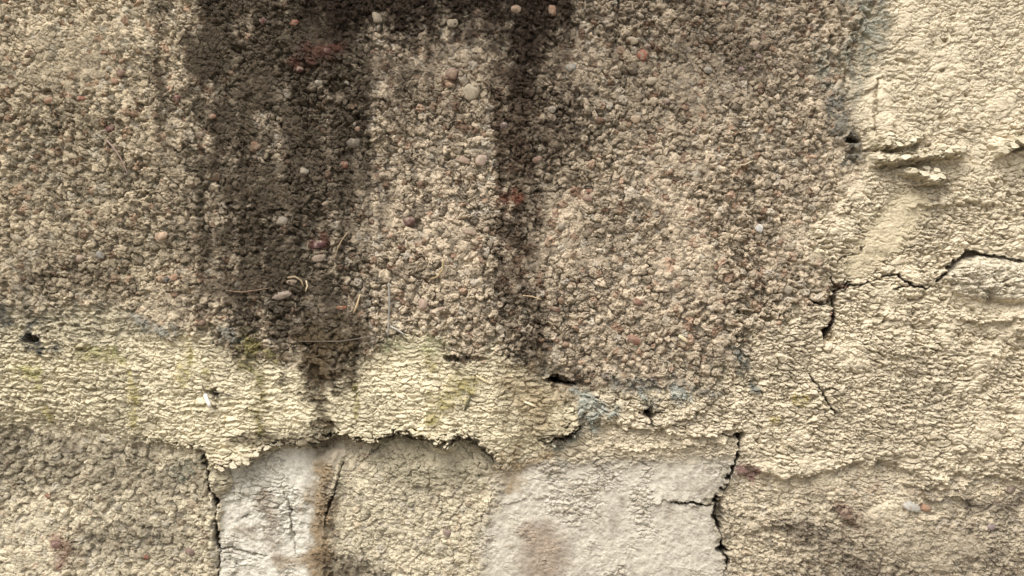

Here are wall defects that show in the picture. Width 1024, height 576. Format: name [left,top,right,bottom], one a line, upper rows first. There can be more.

damp [154,61,166,135]
damp [180,0,571,442]
spalling [846,134,967,277]
peeling [995,131,1024,154]
crack [809,247,1023,336]
crack [199,449,224,576]
damp [226,434,305,446]
spalling [216,439,333,576]
spalling [373,432,737,576]
crack [675,432,741,563]
crack [809,375,836,414]